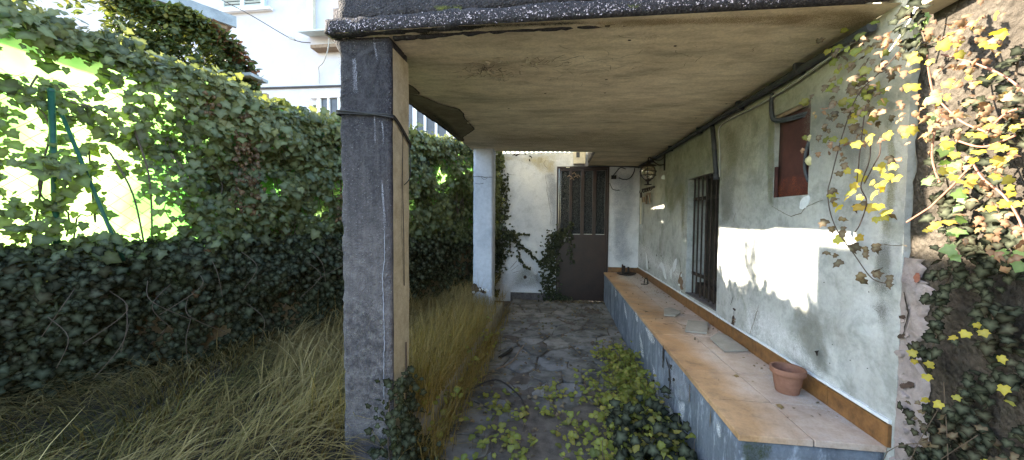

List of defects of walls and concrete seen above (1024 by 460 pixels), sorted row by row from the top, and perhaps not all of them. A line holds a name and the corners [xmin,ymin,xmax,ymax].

peeling [409,84,475,141]